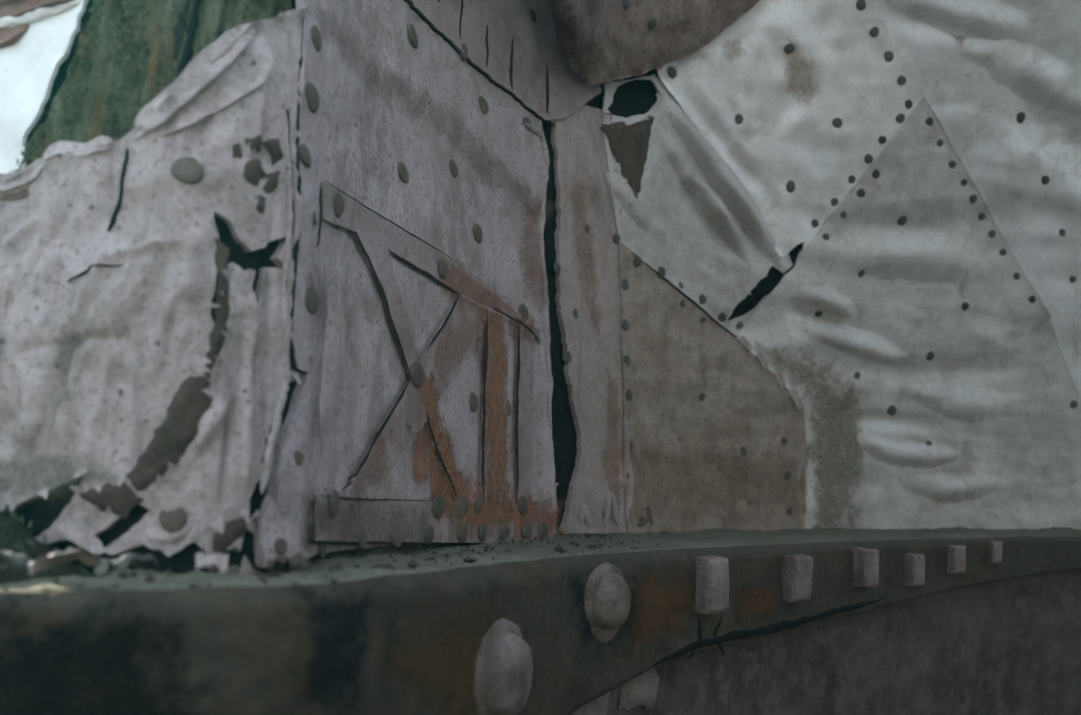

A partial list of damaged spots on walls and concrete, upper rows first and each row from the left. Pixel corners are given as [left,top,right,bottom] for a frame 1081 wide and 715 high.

peeling [0,0,80,49]
peeling [0,135,113,201]
peeling [133,23,274,139]
crack [438,0,514,93]
crack [543,65,551,113]
spalling [600,80,665,194]
peeling [233,79,302,494]
spalling [4,237,260,577]
corrosion [413,269,563,538]